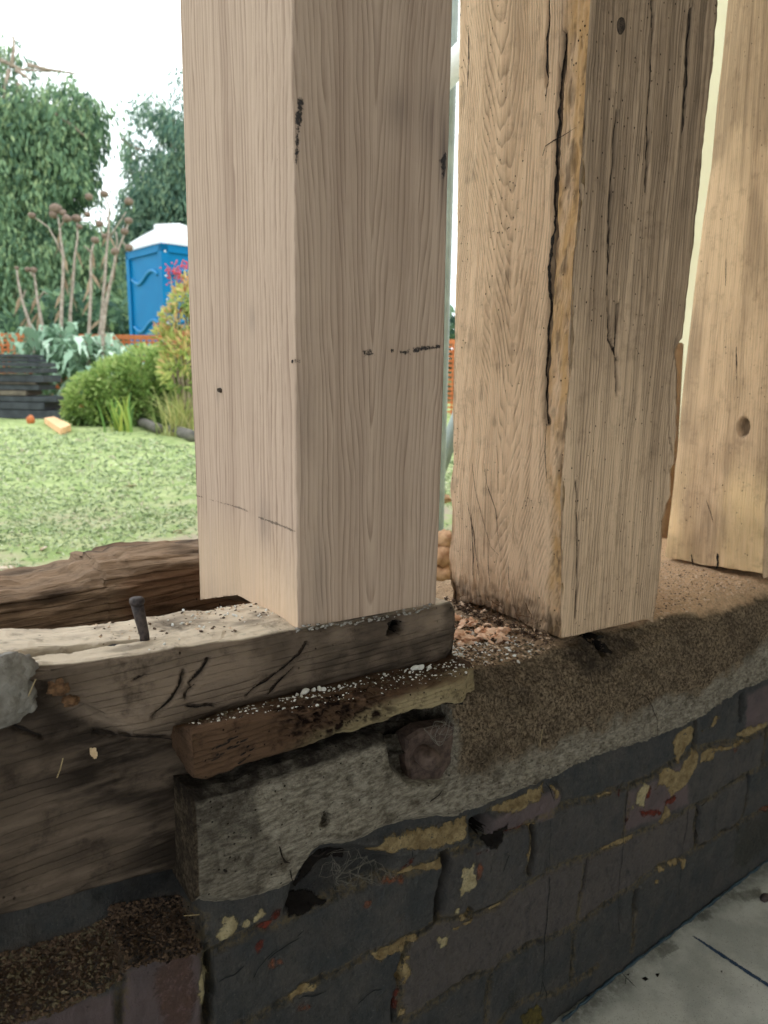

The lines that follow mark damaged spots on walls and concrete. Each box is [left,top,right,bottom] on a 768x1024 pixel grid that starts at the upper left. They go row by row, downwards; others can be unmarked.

crack [542,0,573,477]
crack [606,114,616,364]
peeling [632,715,720,825]
peeling [216,908,266,941]
peeling [371,933,418,962]
peeling [437,863,477,949]